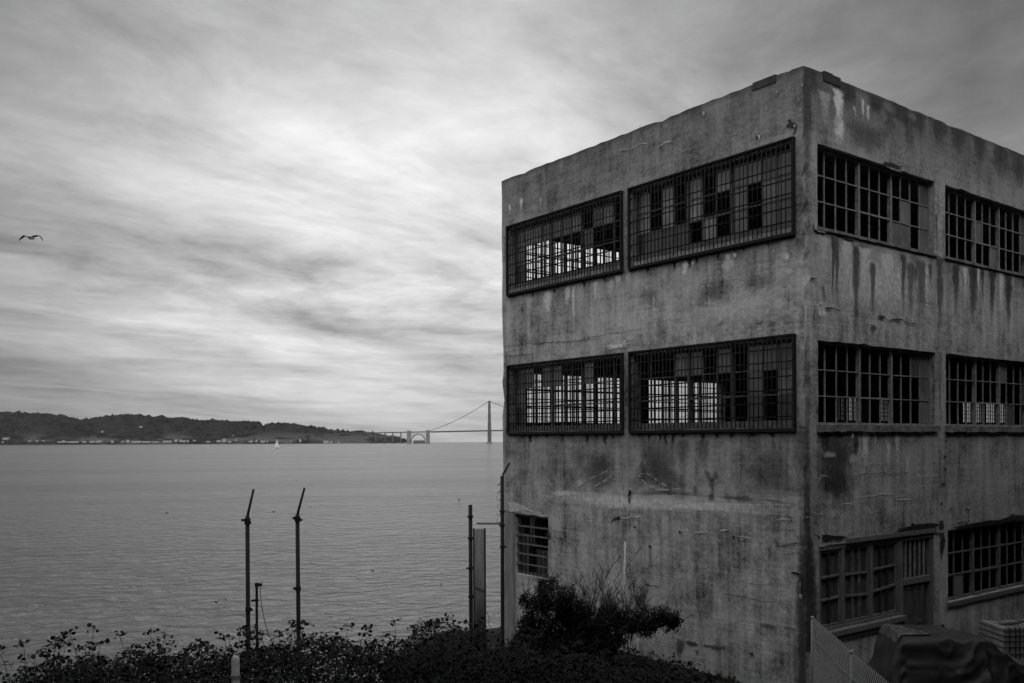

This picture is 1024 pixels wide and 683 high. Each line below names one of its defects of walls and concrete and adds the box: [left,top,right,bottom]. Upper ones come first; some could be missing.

leakage [803,71,881,151]
leakage [897,106,964,146]
leakage [976,139,1023,173]
leakage [820,235,1012,343]
leakage [554,425,911,683]